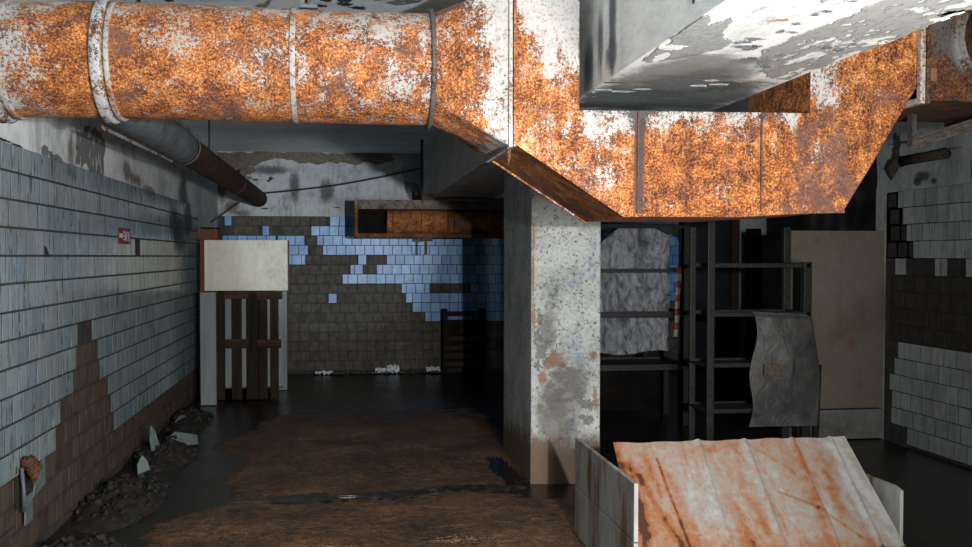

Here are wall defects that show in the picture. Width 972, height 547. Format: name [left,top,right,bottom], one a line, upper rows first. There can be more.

peeling [317,0,421,10]
spalling [643,0,972,80]
peeling [219,216,451,371]
peeling [430,283,468,293]
peeling [486,321,504,368]
peeling [600,301,678,360]
peeling [887,192,972,353]
peeling [0,320,199,547]